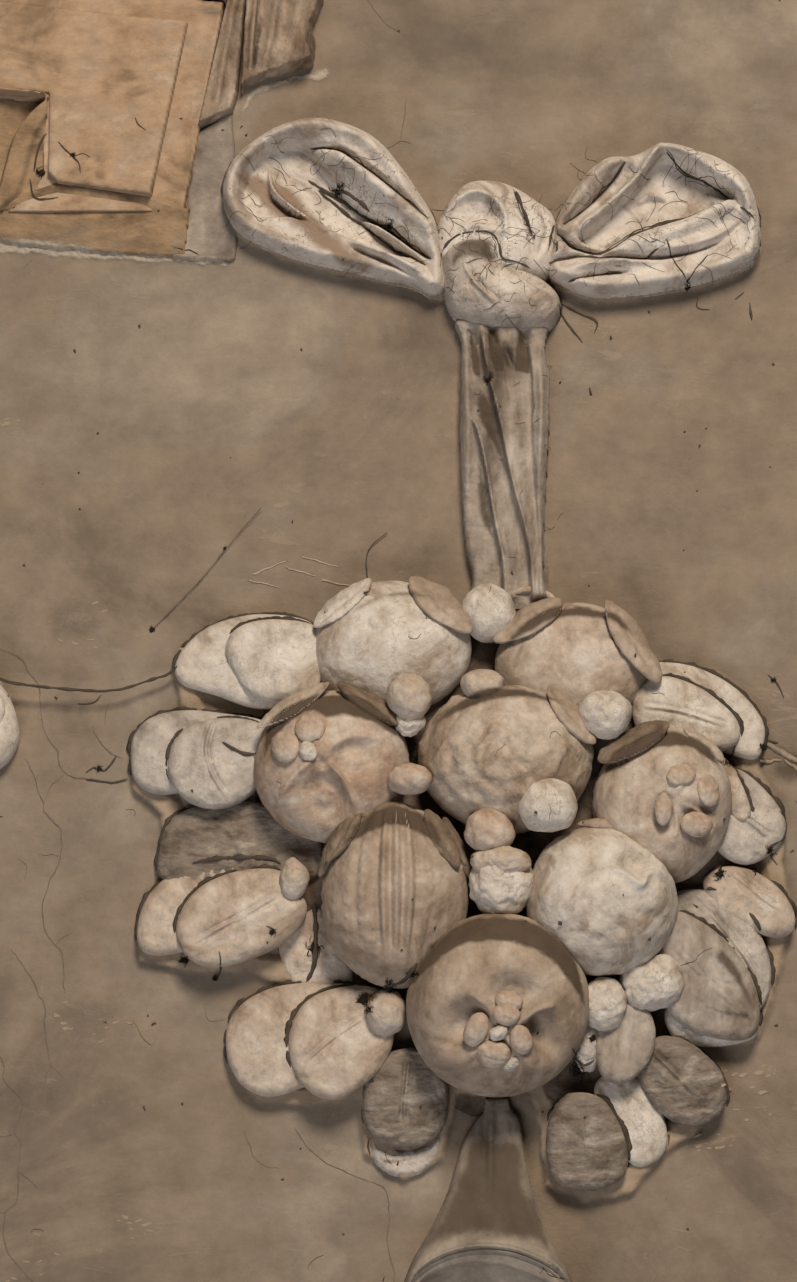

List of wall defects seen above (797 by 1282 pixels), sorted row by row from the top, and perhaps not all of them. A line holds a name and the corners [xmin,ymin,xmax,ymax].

crack [0,650,86,1282]
crack [294,1128,395,1276]